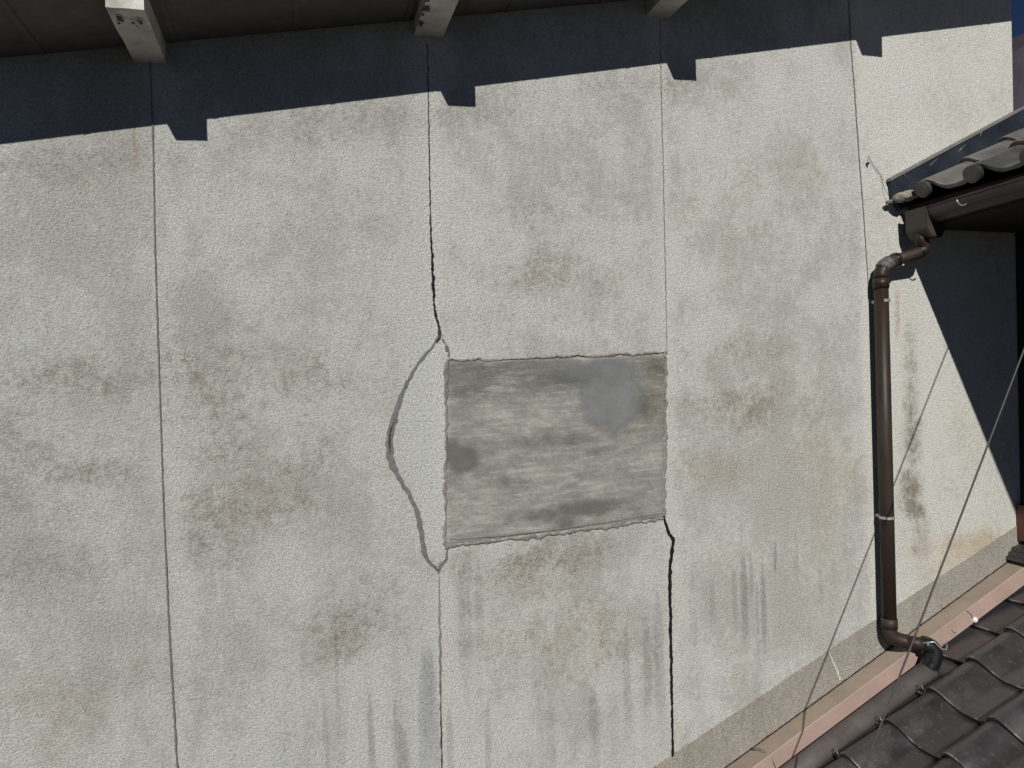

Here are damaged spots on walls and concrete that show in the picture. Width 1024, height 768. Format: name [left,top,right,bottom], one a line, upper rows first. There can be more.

crack [385,44,452,768]
crack [663,515,675,757]